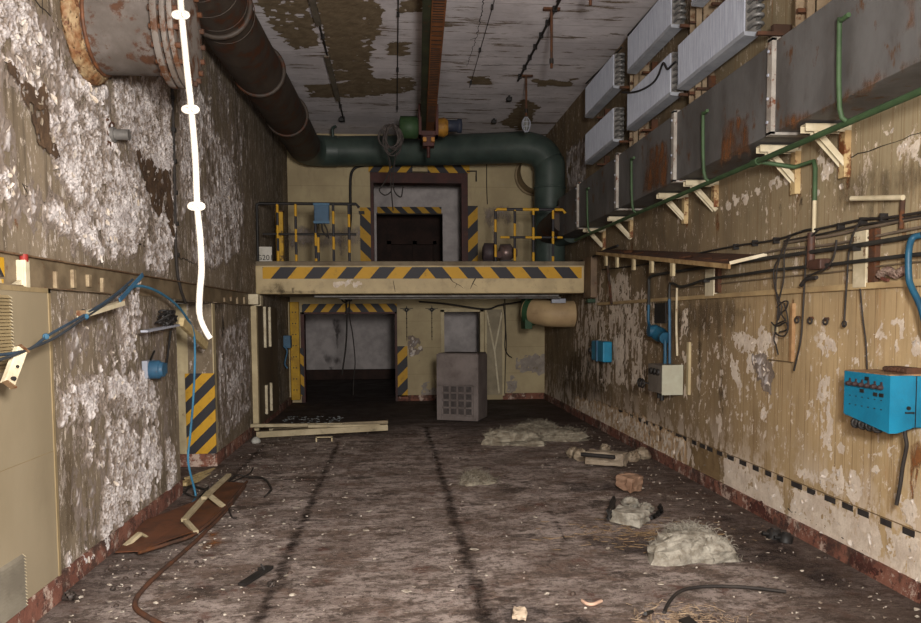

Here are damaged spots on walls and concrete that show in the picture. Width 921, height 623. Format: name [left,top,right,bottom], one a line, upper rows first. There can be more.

peeling [0,0,245,279]
spalling [253,0,422,98]
spalling [467,76,492,85]
spalling [499,99,541,130]
spalling [531,78,579,87]
crack [851,132,921,158]
peeling [897,137,921,167]
peeling [57,281,177,568]
peeling [218,316,251,440]
peeling [562,272,921,600]